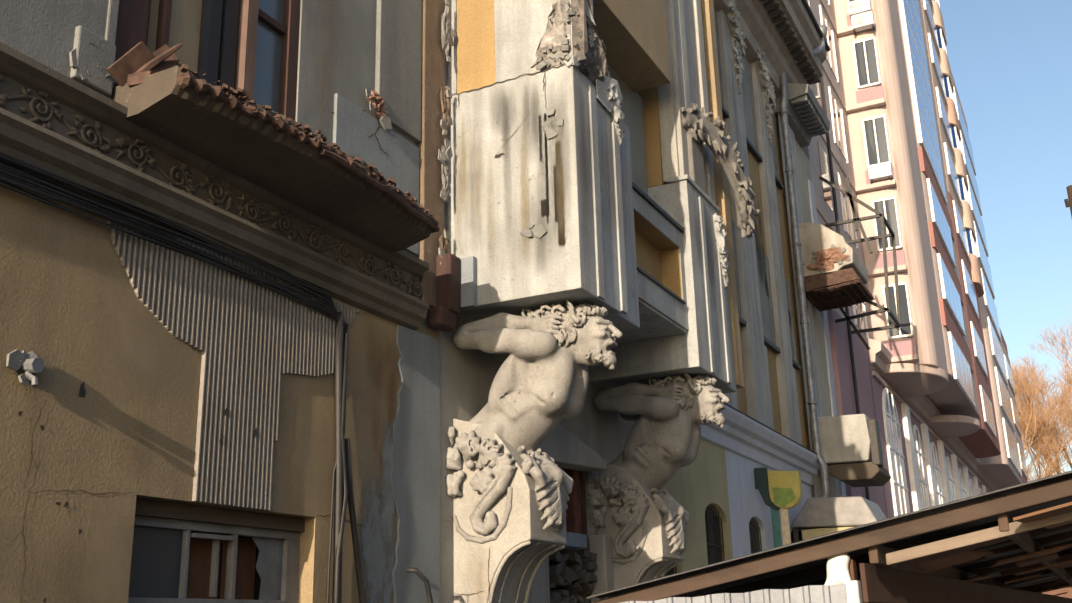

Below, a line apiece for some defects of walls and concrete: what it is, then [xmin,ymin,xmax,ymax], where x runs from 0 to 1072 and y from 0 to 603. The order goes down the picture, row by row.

spalling [365,89,392,130]
flaking render [438,86,453,203]
flaking render [441,0,456,63]
crack [452,64,565,154]
spalling [526,0,623,112]
flaking render [438,227,451,265]
crack [8,400,132,598]
peeling [361,426,396,603]